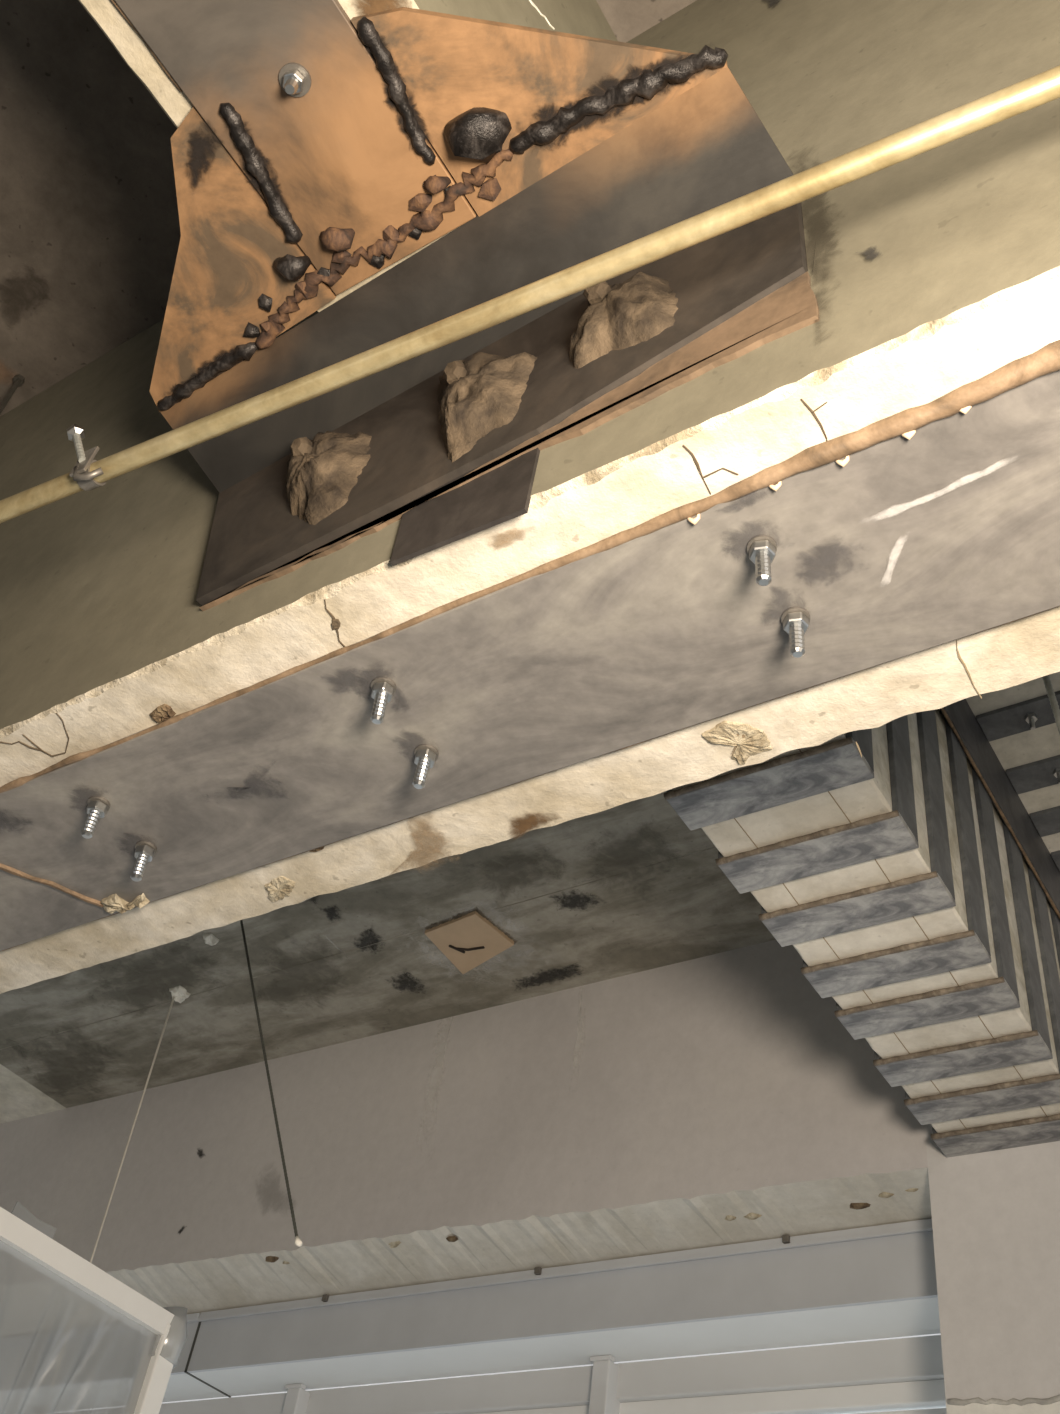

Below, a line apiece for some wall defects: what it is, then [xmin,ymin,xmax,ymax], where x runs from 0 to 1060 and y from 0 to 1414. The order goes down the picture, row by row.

spalling [702,720,773,765]
peeling [947,1394,1060,1406]